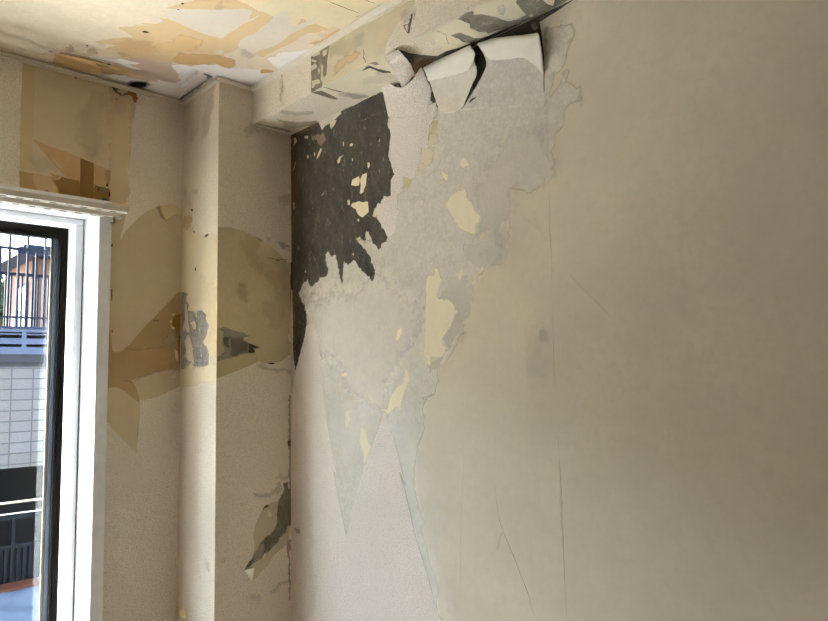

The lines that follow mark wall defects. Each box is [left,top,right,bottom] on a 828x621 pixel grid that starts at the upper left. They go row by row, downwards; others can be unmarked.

peeling [311,45,341,99]
peeling [394,0,572,108]
peeling [291,92,411,370]
flaking render [181,292,260,370]
peeling [245,479,291,581]